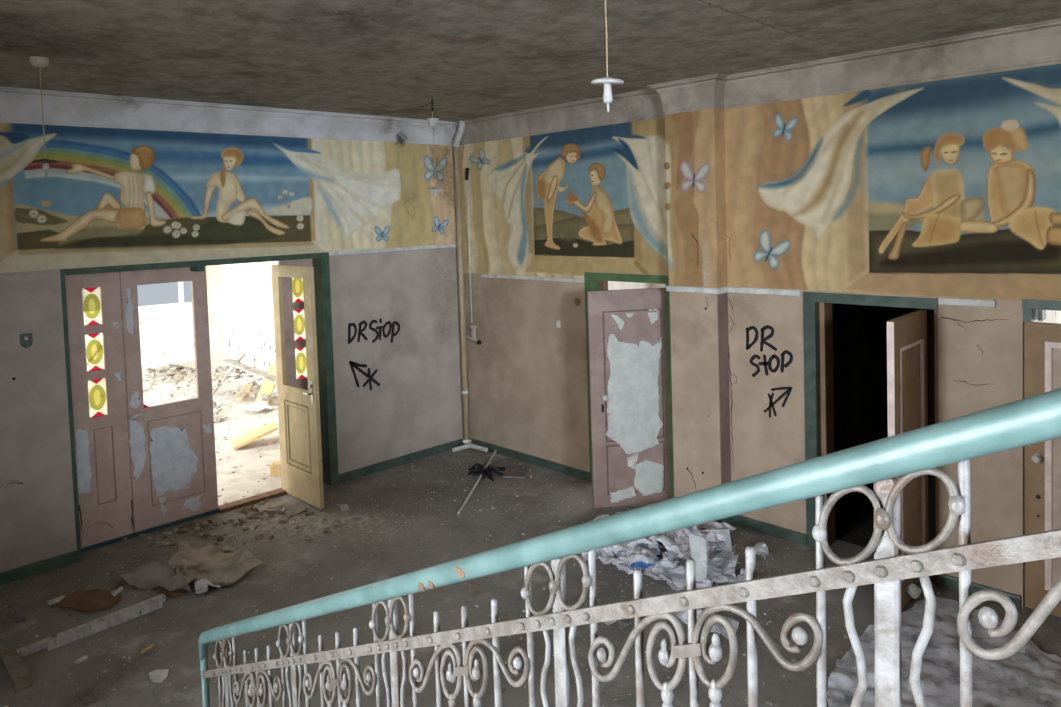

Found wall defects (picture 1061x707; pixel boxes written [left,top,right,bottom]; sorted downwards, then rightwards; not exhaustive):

peeling [112,288,134,335]
crack [941,317,1009,353]
peeling [606,313,664,503]
peeling [75,429,92,494]
peeling [129,391,202,517]